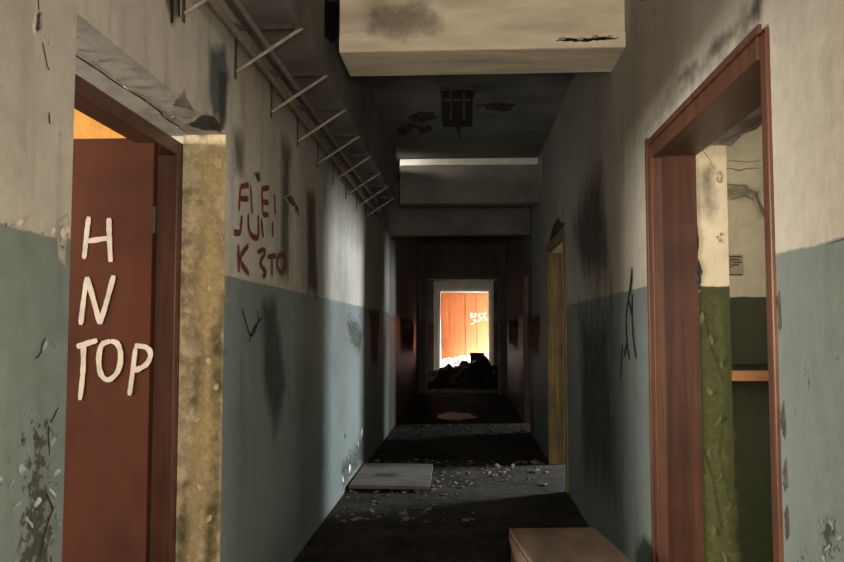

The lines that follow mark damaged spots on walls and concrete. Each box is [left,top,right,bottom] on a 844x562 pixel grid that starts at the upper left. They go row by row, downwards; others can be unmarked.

crack [32,0,50,71]
crack [703,151,761,183]
peeling [819,515,842,562]